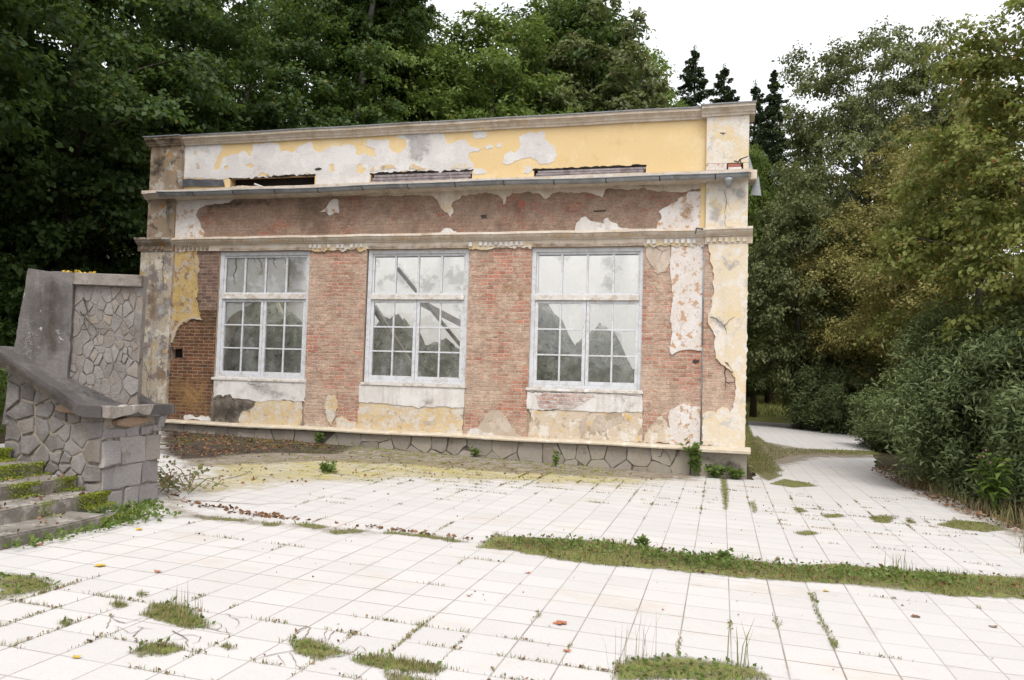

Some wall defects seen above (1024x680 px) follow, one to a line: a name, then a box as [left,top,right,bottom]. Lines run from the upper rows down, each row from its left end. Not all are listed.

flaking render [184,131,701,237]
flaking render [101,245,702,445]
water stain [161,402,349,459]